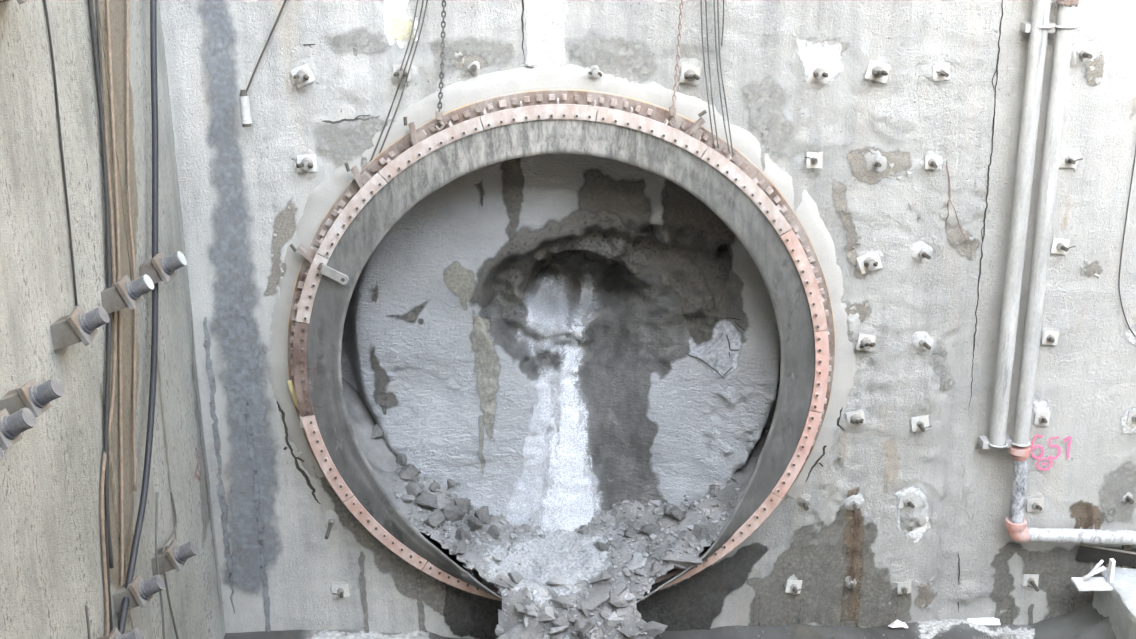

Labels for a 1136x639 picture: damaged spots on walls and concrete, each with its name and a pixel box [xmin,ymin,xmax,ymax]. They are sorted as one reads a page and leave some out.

crack [945,0,1003,409]
corrosion [1085,504,1093,529]